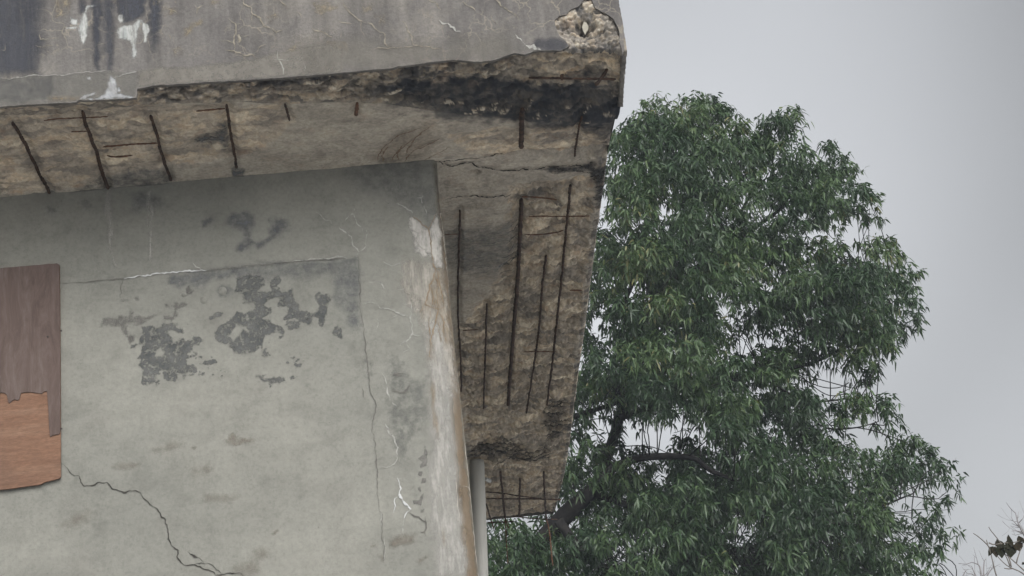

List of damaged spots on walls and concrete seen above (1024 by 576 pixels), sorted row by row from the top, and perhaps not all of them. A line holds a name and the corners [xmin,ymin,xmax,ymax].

leakage [0,0,52,101]
leakage [70,0,161,100]
spalling [0,0,627,566]
crack [70,153,593,558]
crack [64,465,243,576]